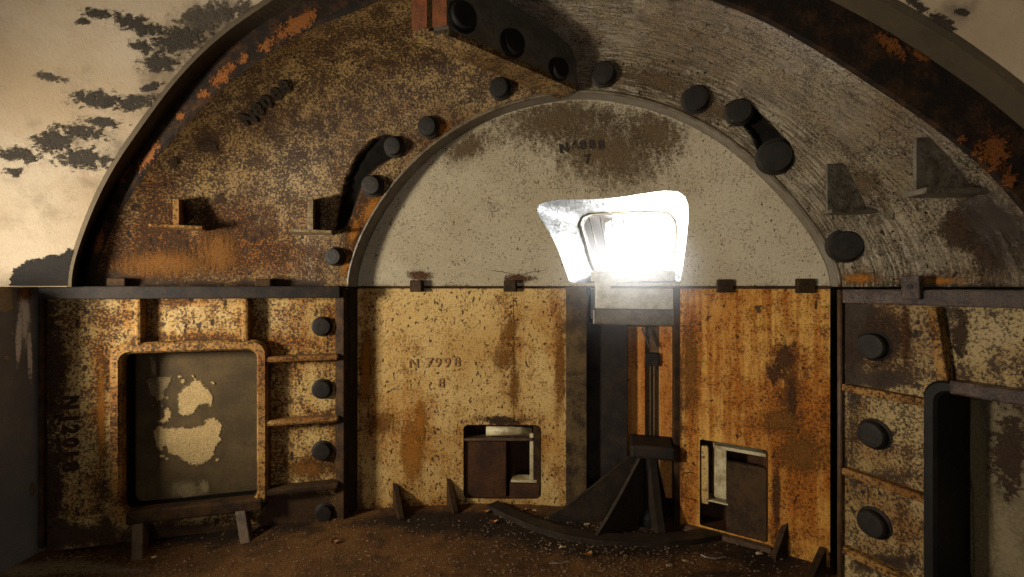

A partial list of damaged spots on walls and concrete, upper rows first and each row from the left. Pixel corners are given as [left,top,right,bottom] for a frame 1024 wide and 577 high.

peeling [118,138,162,188]
rust [111,231,240,279]
rust [341,196,381,275]
rust [407,270,432,280]
rust [47,299,70,528]
peeling [146,375,223,465]
rust [480,416,526,425]
rust [492,319,519,405]
rust [554,319,566,417]
rust [766,342,797,414]
rust [950,307,969,376]
rust [772,463,780,537]